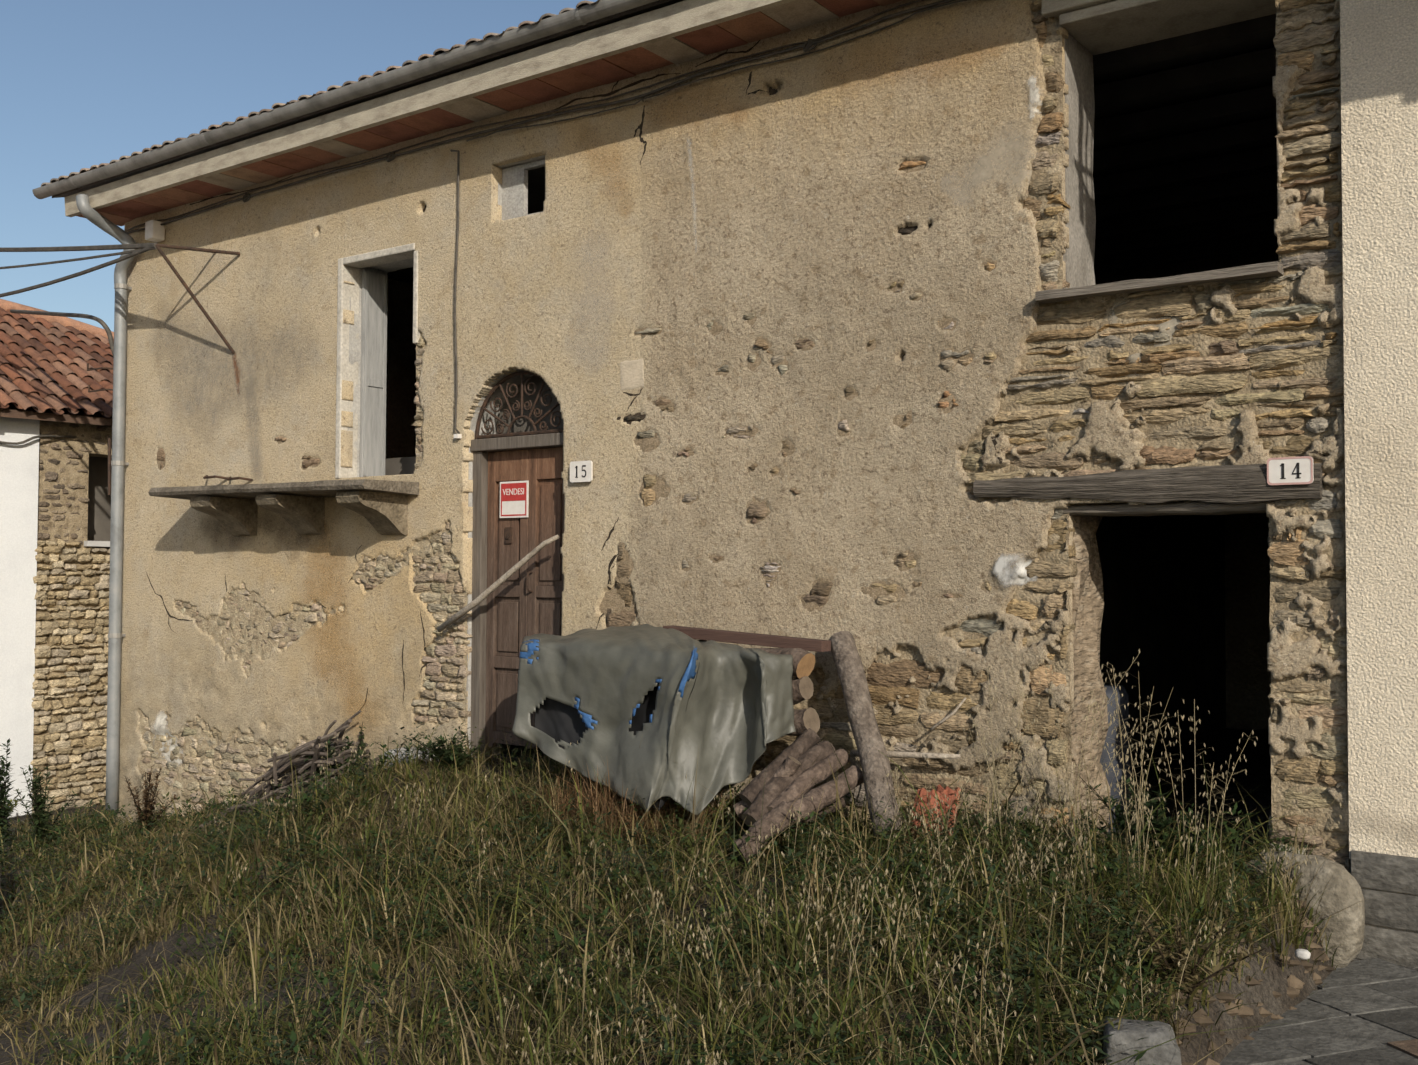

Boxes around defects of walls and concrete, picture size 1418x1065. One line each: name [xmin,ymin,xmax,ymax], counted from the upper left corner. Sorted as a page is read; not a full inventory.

crack [553,40,770,165]
spalling [939,348,999,373]
flaking render [961,0,1351,869]
spalling [746,500,771,524]
spalling [138,709,308,824]
spalling [175,583,345,678]
spalling [352,521,473,726]
spalling [599,542,638,627]
flaking render [748,735,799,779]
spalling [801,578,833,612]
flaking render [793,667,857,790]
flaking render [861,504,1078,840]